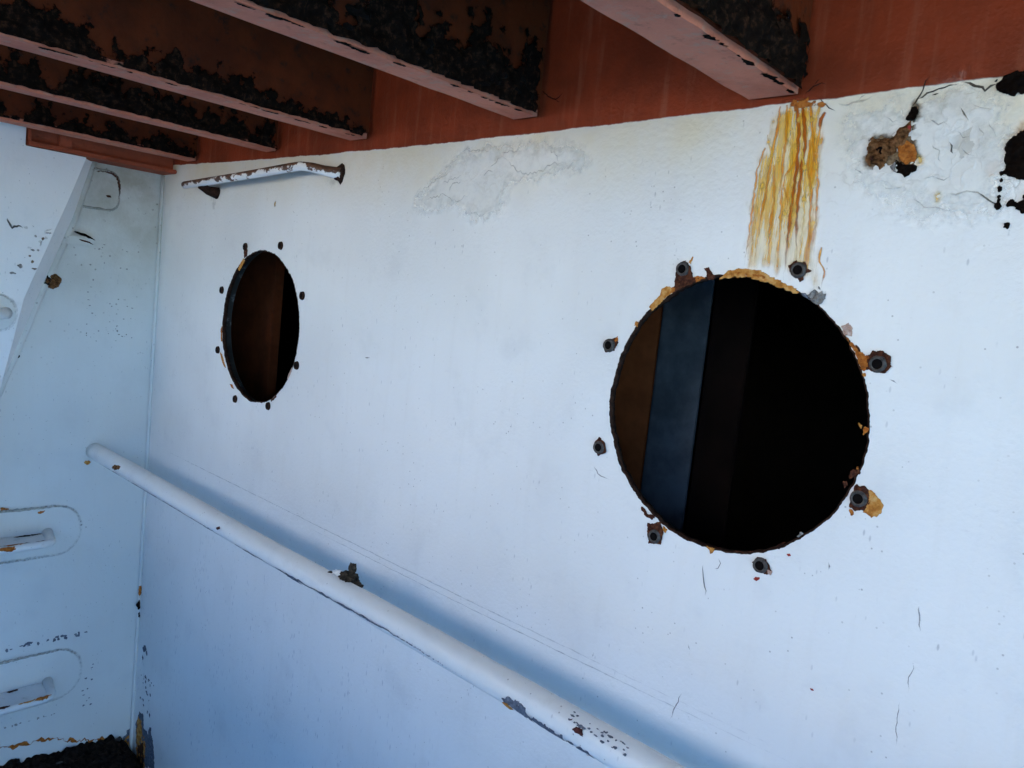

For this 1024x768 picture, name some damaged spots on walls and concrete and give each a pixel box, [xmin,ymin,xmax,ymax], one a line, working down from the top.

corrosion [649,0,826,311]
peeling [864,103,922,178]
corrosion [44,274,62,289]
corrosion [842,466,884,518]
peeling [501,696,629,758]